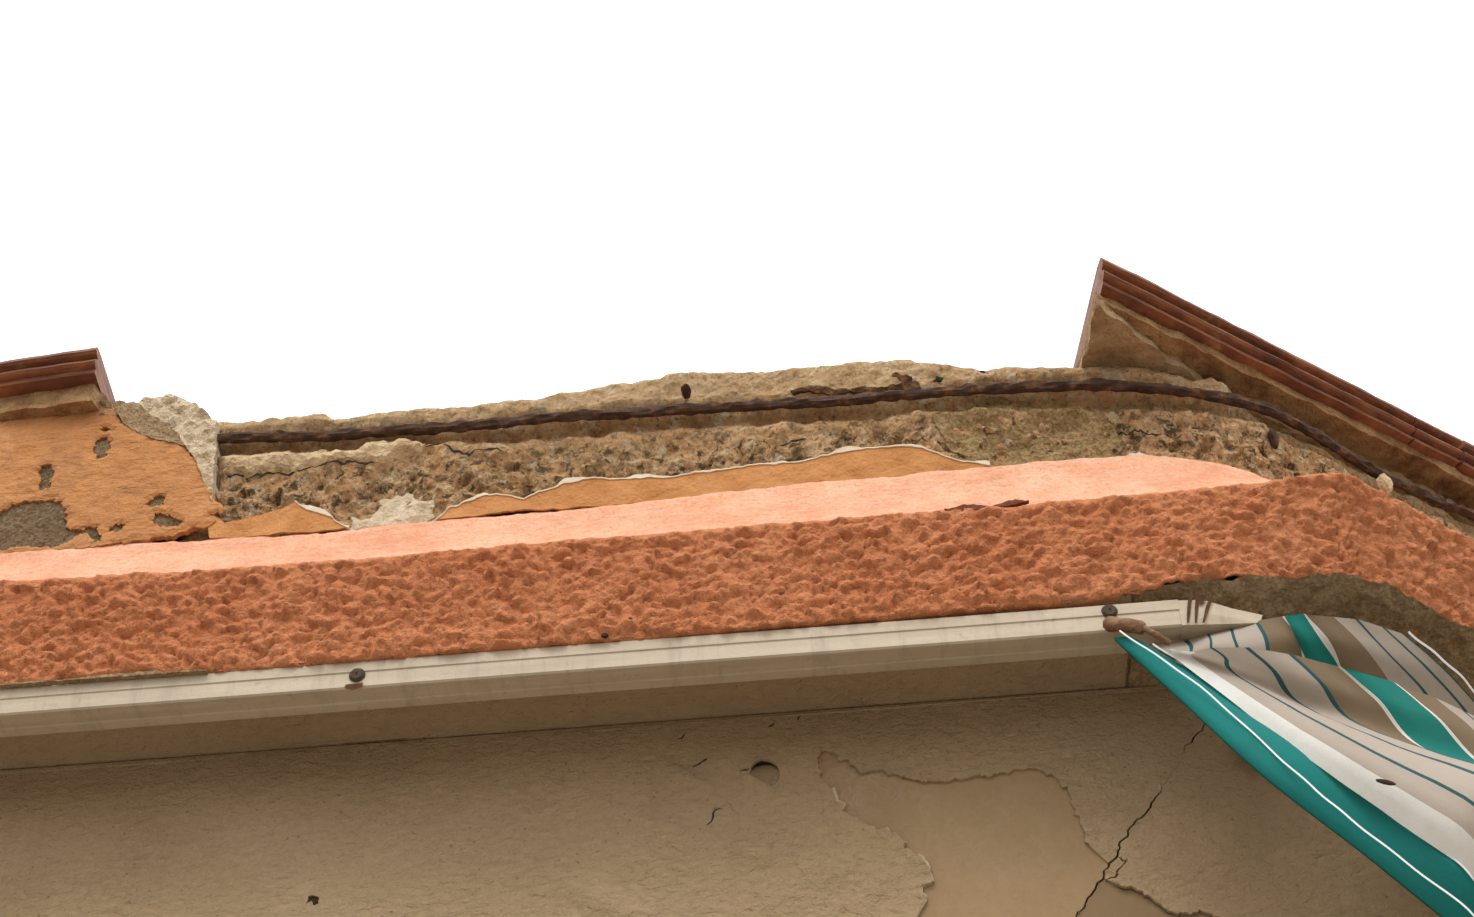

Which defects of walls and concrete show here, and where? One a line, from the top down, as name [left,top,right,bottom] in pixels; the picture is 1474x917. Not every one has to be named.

peeling [0,466,123,551]
spalling [94,359,1474,542]
peeling [818,753,1211,917]
crack [1076,788,1162,917]